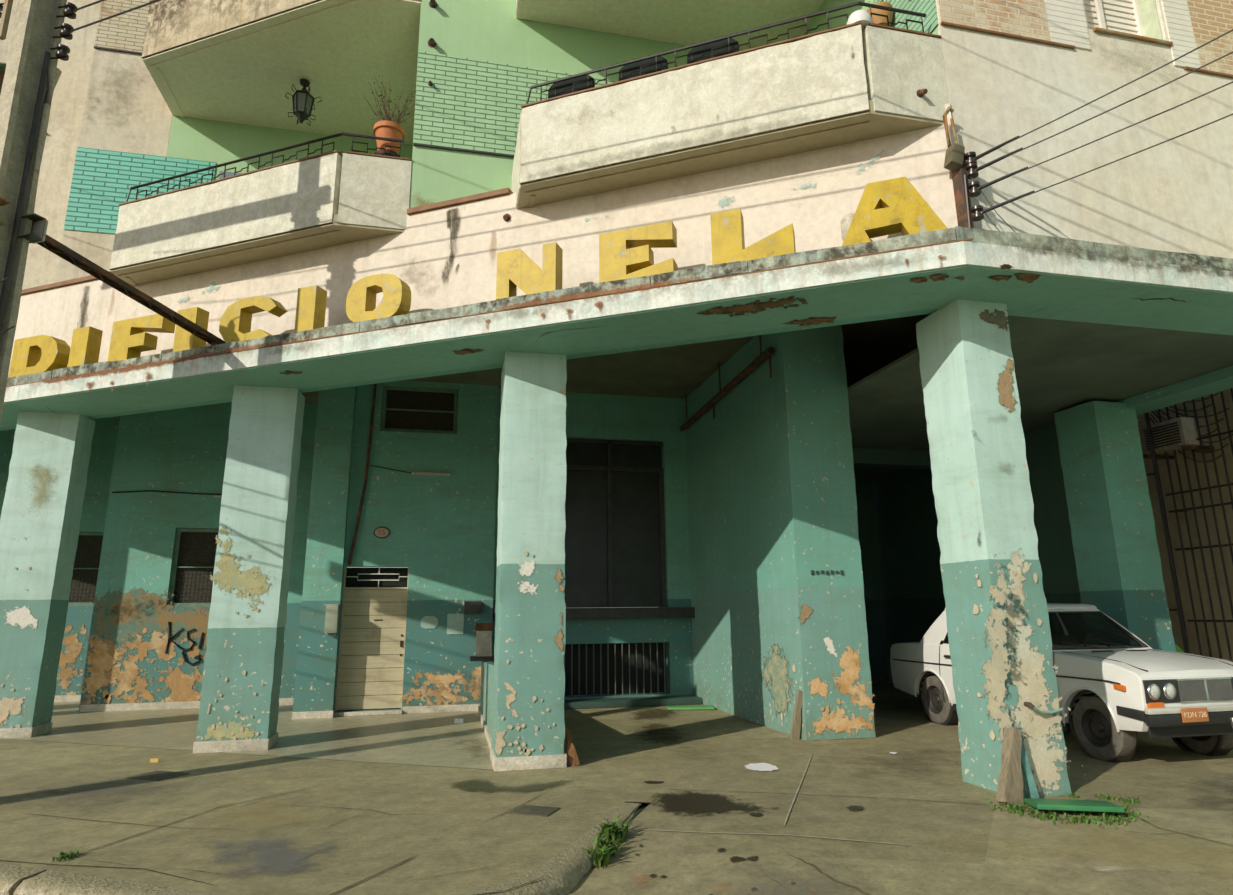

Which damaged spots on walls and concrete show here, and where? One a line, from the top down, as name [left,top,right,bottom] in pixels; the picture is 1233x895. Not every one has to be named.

damp [442,208,460,280]
spalling [997,358,1019,413]
peeling [210,519,276,617]
peeling [517,551,539,596]
peeling [0,684,26,728]
peeling [57,587,259,741]
peeling [399,666,481,706]
peeling [494,682,555,756]
spalling [554,612,564,650]
spalling [797,604,813,624]
peeling [792,637,875,737]
peeling [973,548,1071,797]